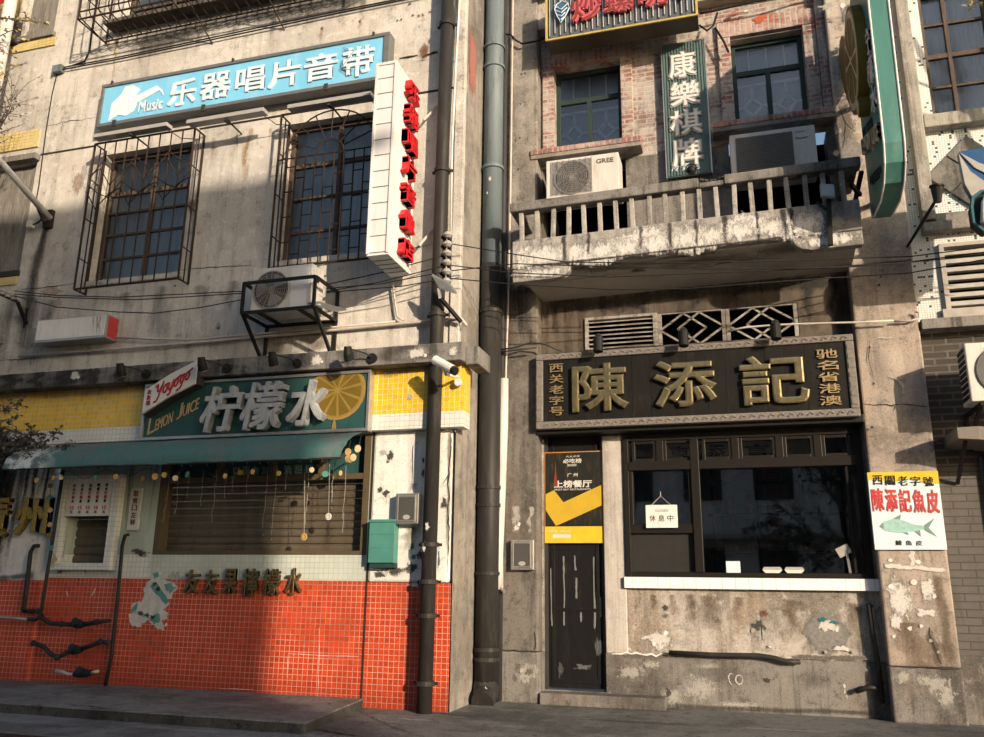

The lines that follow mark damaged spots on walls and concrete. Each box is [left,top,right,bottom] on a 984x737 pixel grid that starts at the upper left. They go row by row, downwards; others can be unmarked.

leakage [528,208,796,272]
leakage [0,453,50,553]
peeling [375,546,426,578]
peeling [558,662,591,679]
peeling [595,624,734,660]
peeling [750,610,773,648]
spalling [787,645,866,661]
peeling [885,558,942,664]